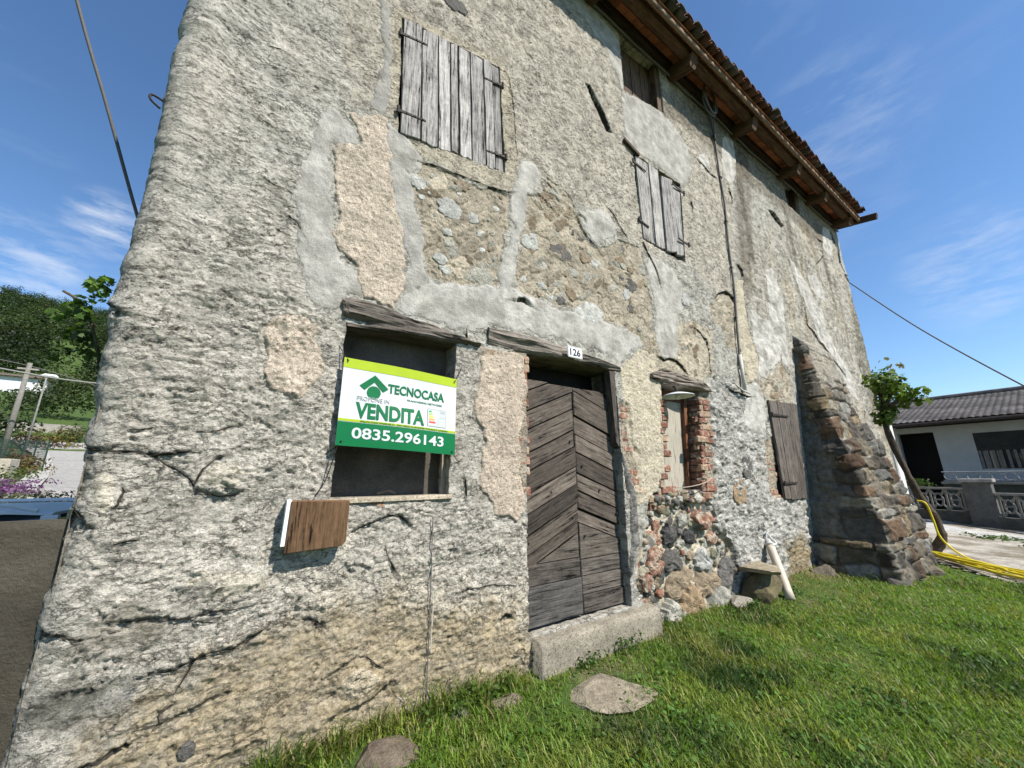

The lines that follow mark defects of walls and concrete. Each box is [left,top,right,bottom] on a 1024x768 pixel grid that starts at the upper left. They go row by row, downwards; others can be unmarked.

spalling [409,160,510,286]
crack [84,426,241,497]
spalling [515,177,753,623]
crack [82,626,268,768]